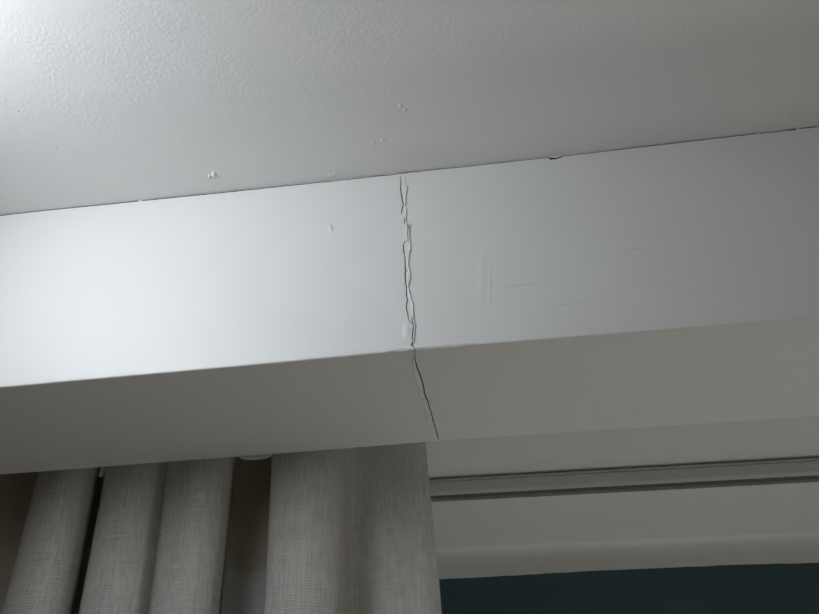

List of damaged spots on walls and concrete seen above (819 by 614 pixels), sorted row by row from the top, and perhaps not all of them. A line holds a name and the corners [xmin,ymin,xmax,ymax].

crack [0,126,819,440]